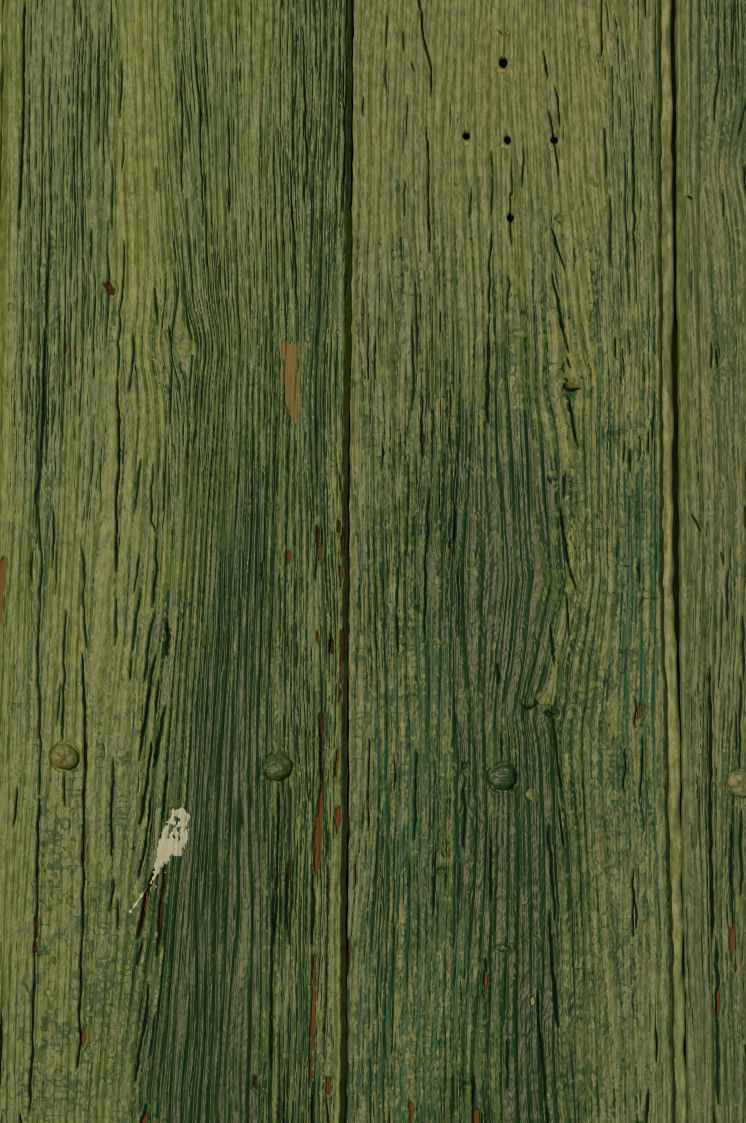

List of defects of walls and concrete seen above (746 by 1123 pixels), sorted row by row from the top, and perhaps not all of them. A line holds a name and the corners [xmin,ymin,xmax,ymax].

crack [0,0,535,1123]
peeling [280,340,303,425]
peeling [314,788,341,875]
crack [520,699,564,1123]
crack [542,0,663,678]
crack [604,239,746,1123]
crack [699,0,746,151]
crack [723,167,746,217]